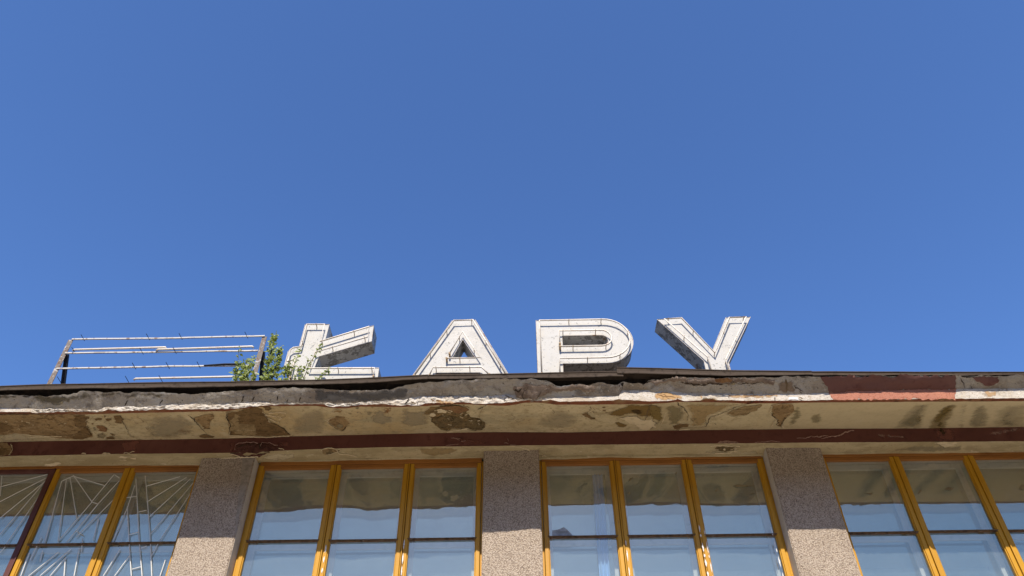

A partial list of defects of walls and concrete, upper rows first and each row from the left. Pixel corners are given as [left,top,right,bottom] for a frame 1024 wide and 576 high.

spalling [513,383,597,402]
peeling [650,376,775,401]
peeling [973,376,999,386]
peeling [0,414,124,456]
peeling [221,407,290,459]
peeling [327,407,373,431]
spalling [424,405,486,446]
peeling [748,397,803,428]
damp [935,407,950,434]